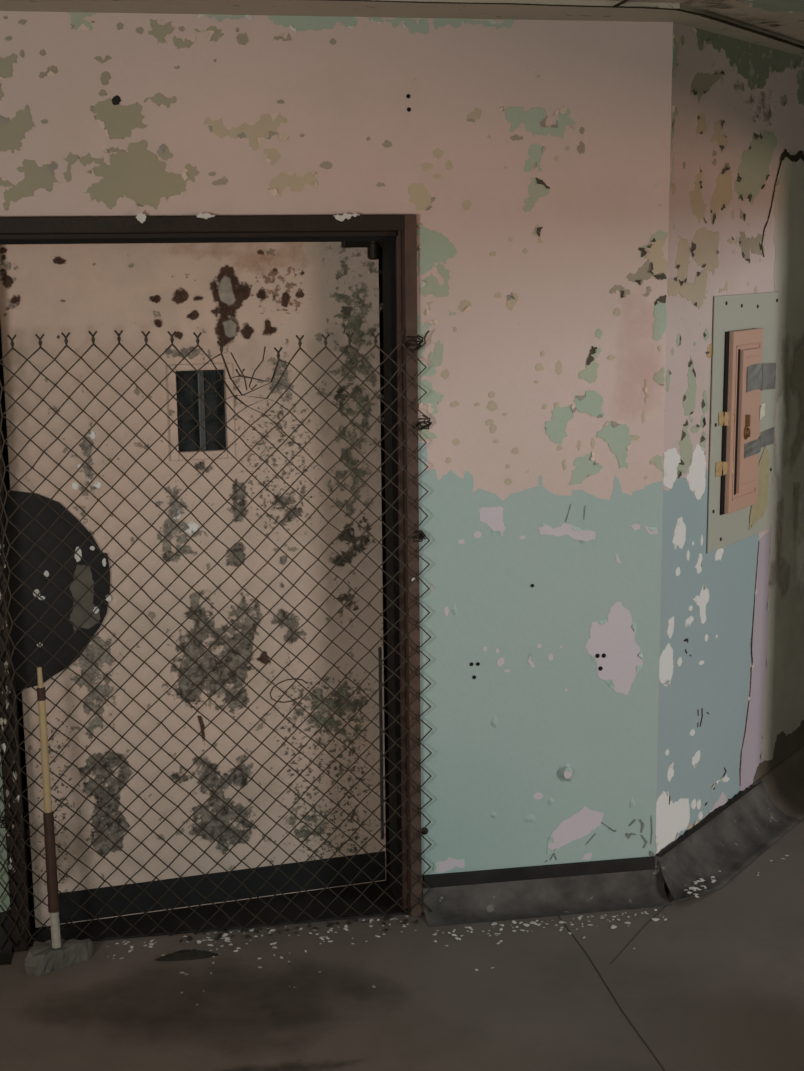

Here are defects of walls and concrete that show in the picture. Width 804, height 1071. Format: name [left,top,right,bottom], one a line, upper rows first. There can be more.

peeling [0,49,228,213]
peeling [204,100,333,197]
peeling [499,106,585,212]
crack [761,149,804,257]
peeling [542,329,640,486]
flaking render [610,27,804,854]
leakage [774,338,804,596]
peeling [585,602,643,695]
leakage [294,678,368,754]
peeling [433,856,465,873]
peeling [547,806,603,855]
crack [557,899,674,1071]